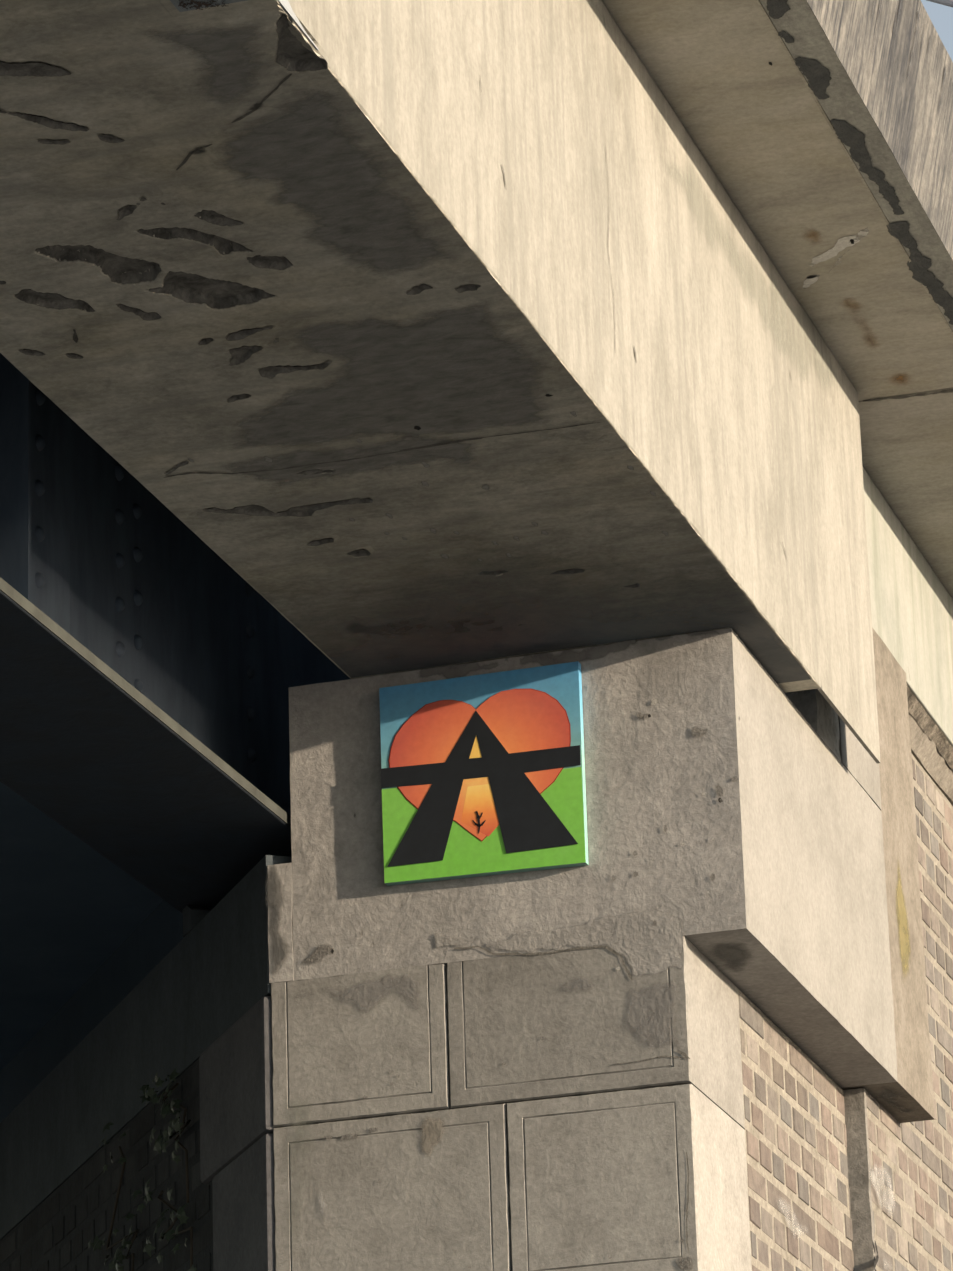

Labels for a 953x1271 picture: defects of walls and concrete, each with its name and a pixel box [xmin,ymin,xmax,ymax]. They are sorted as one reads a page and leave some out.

spalling [276,14,328,71]
spalling [0,61,71,77]
spalling [0,110,124,145]
spalling [117,197,147,220]
spalling [138,210,293,270]
spalling [36,245,275,309]
spalling [0,281,95,312]
spalling [118,304,161,321]
spalling [199,326,278,365]
spalling [259,361,332,379]
damp [267,867,288,972]
crack [454,946,633,980]